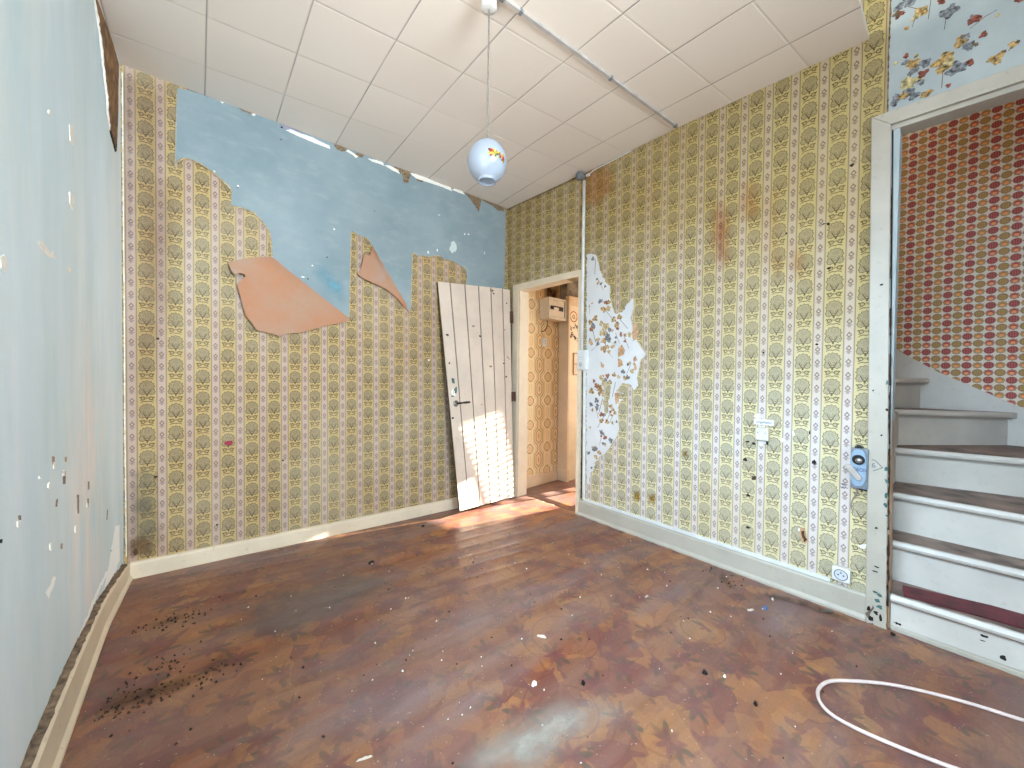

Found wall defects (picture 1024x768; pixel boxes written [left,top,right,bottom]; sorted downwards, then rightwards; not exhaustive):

peeling [173,88,506,337]
peeling [586,254,646,497]